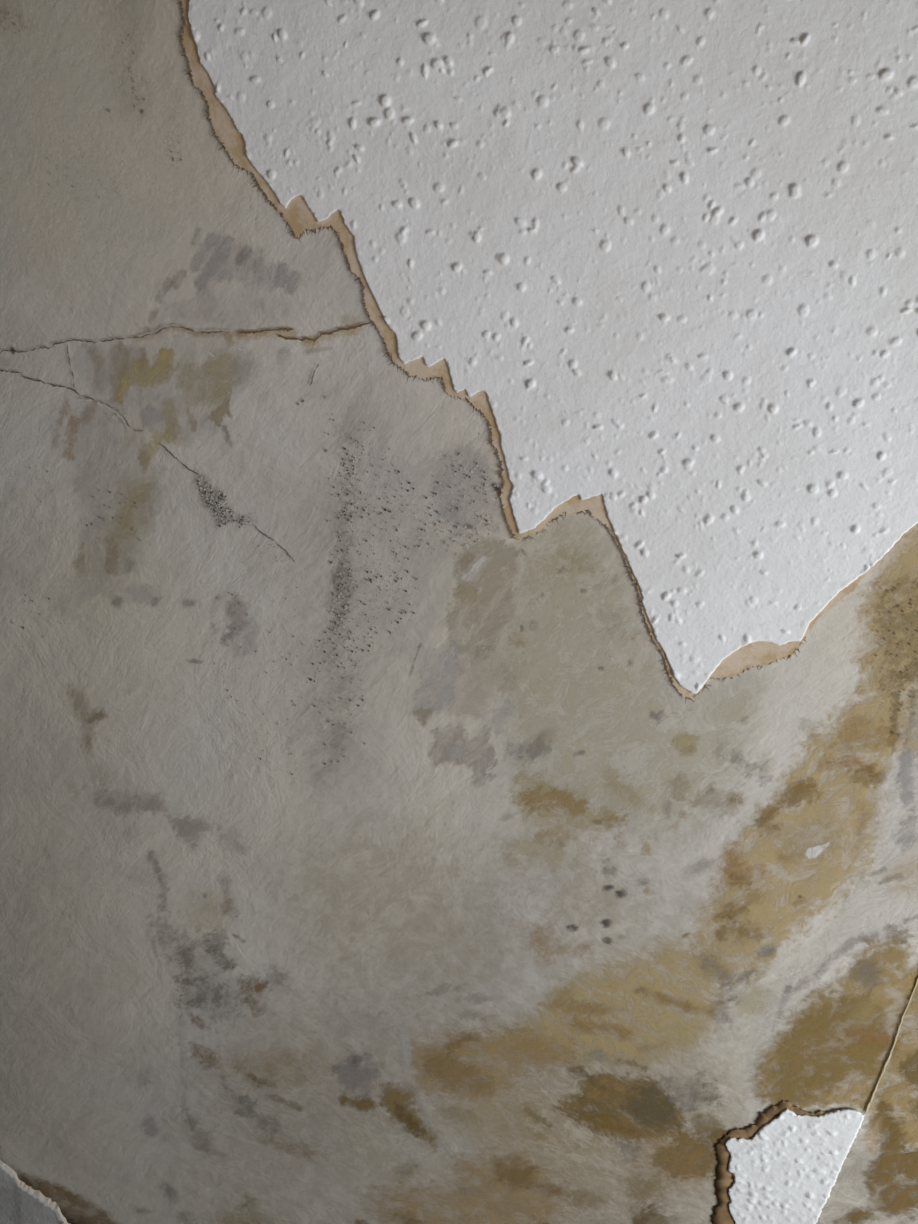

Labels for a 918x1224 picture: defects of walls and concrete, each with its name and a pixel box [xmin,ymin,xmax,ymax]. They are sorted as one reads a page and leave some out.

crack [0,322,370,474]
flaking render [197,474,252,528]
crack [252,523,295,562]
peeling [449,541,519,656]
water stain [335,530,918,1224]